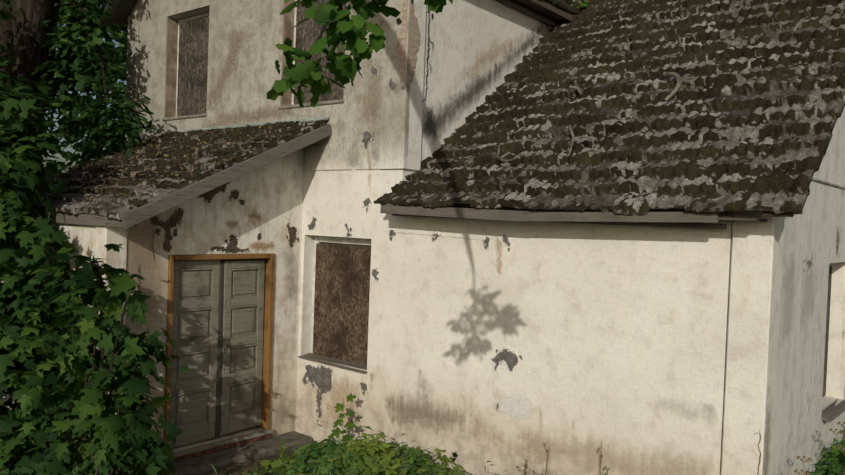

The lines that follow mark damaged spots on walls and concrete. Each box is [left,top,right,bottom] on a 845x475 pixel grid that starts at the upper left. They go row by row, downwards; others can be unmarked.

flaking render [367,0,420,95]
crack [423,11,434,101]
spalling [147,180,245,258]
spalling [206,230,264,254]
spalling [284,213,319,250]
spalling [387,226,399,241]
spalling [429,228,443,244]
spalling [479,230,514,252]
spalling [488,343,524,375]
spalling [301,360,336,427]
water stain [389,400,456,423]